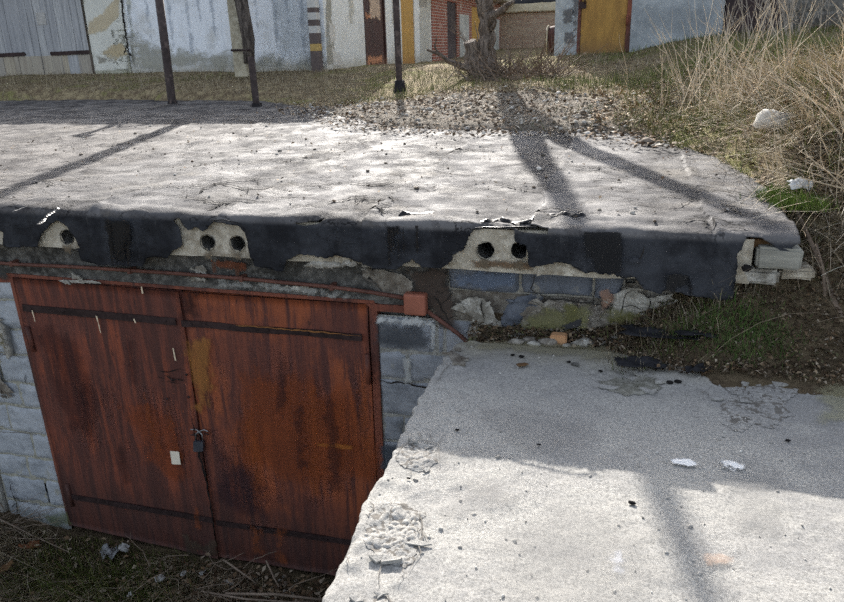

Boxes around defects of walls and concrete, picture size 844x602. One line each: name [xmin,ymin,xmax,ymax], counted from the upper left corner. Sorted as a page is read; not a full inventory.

peeling [84,0,129,71]
crack [120,0,132,57]
peeling [365,0,380,20]
crack [0,163,97,190]
spalling [598,371,667,396]
spalling [711,381,798,432]
spalling [395,435,438,475]
spalling [363,501,432,573]
spalling [349,591,395,602]